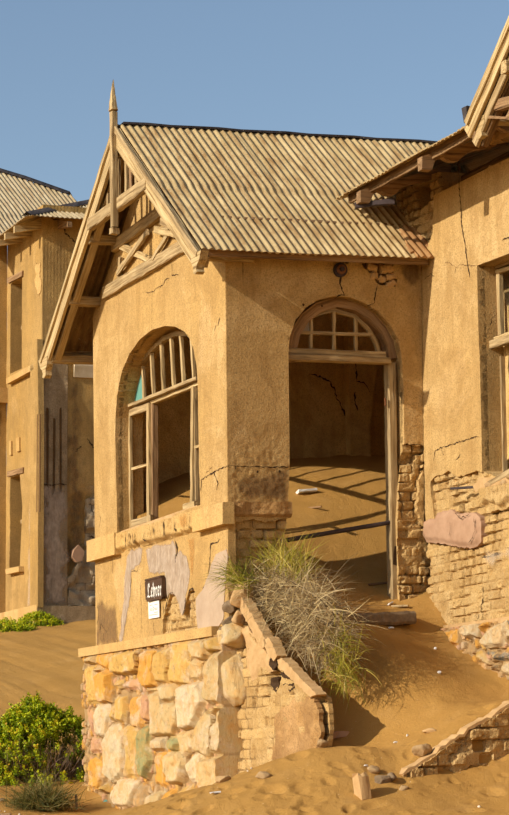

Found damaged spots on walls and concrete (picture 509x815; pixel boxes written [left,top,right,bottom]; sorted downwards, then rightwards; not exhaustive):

crack [424,161,475,280]
crack [311,364,370,416]
crack [404,436,477,461]
crack [200,465,288,490]
spalling [67,496,95,606]